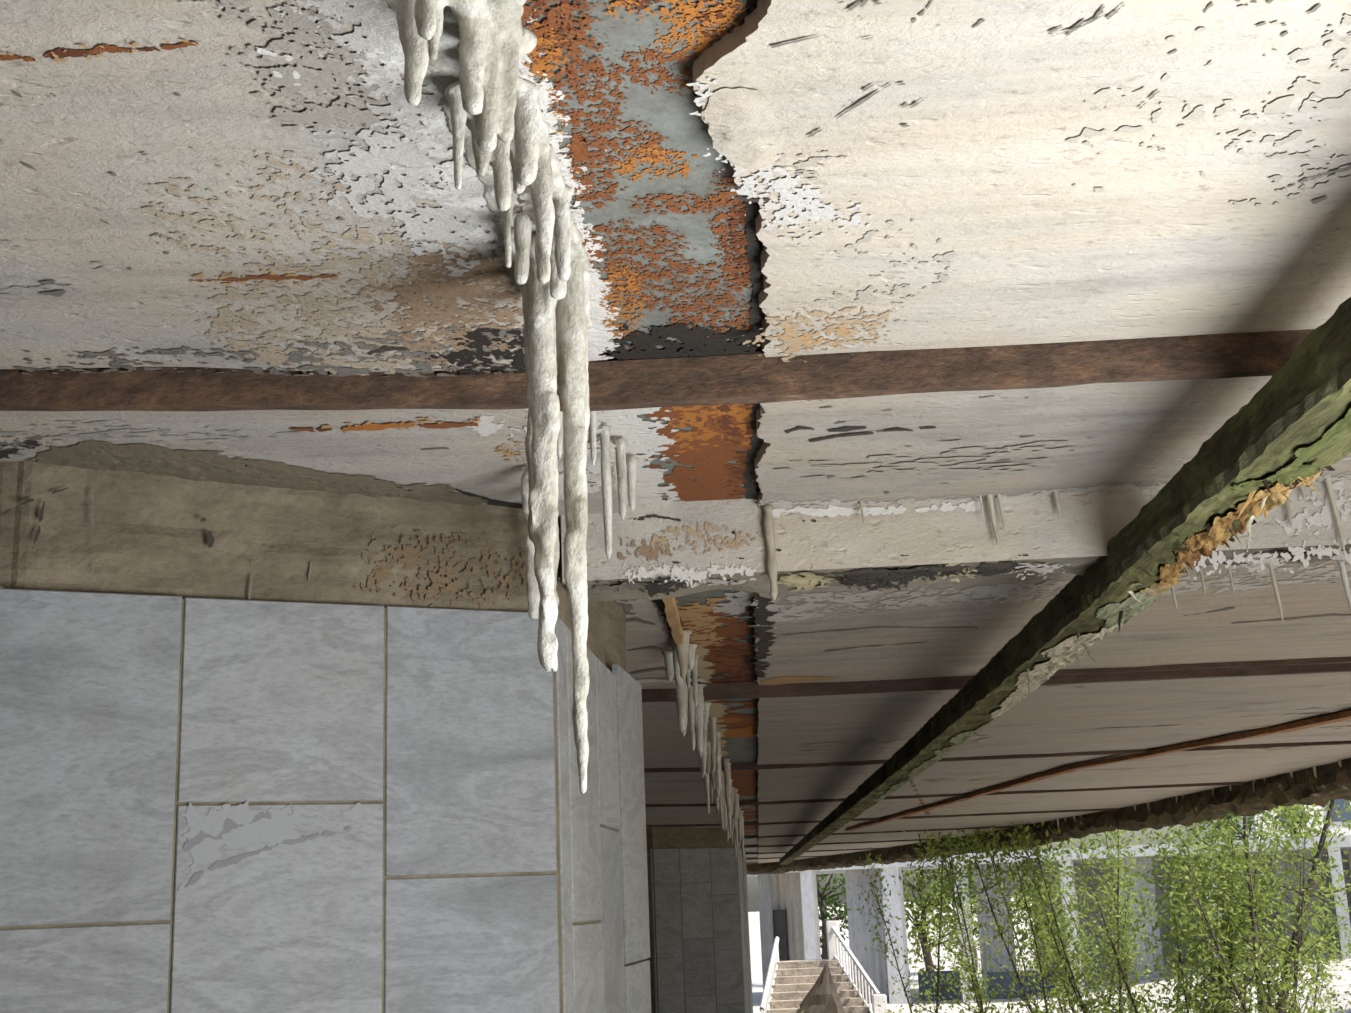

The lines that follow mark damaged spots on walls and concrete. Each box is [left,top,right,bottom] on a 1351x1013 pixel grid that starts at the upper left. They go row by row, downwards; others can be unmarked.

corrosion [0,39,199,65]
peeling [212,0,405,133]
crack [1051,10,1113,37]
leakage [14,0,536,377]
efflorescence [518,52,624,362]
corrosion [521,0,764,362]
crack [1288,164,1351,204]
corrosion [290,417,481,432]
corrosion [644,404,763,501]
leakage [617,522,1071,629]
spalling [835,554,1031,590]
leakage [1159,457,1351,597]